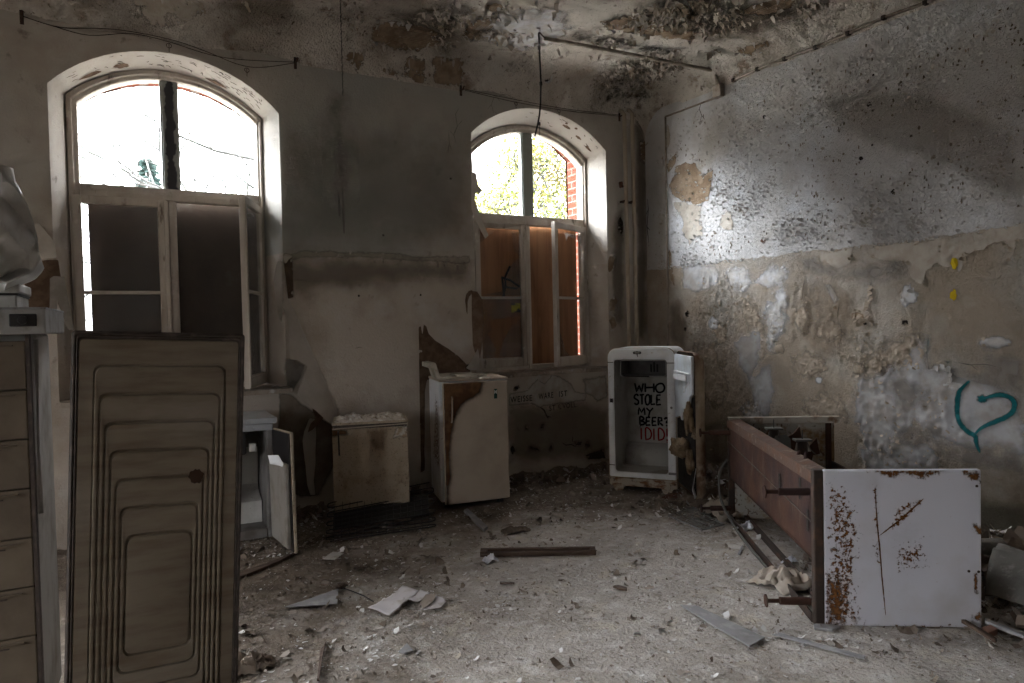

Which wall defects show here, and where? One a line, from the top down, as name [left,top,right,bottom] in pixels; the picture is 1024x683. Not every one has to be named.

peeling [292,0,837,97]
peeling [640,2,1024,425]
flaking render [766,271,959,469]
water stain [857,349,1022,469]